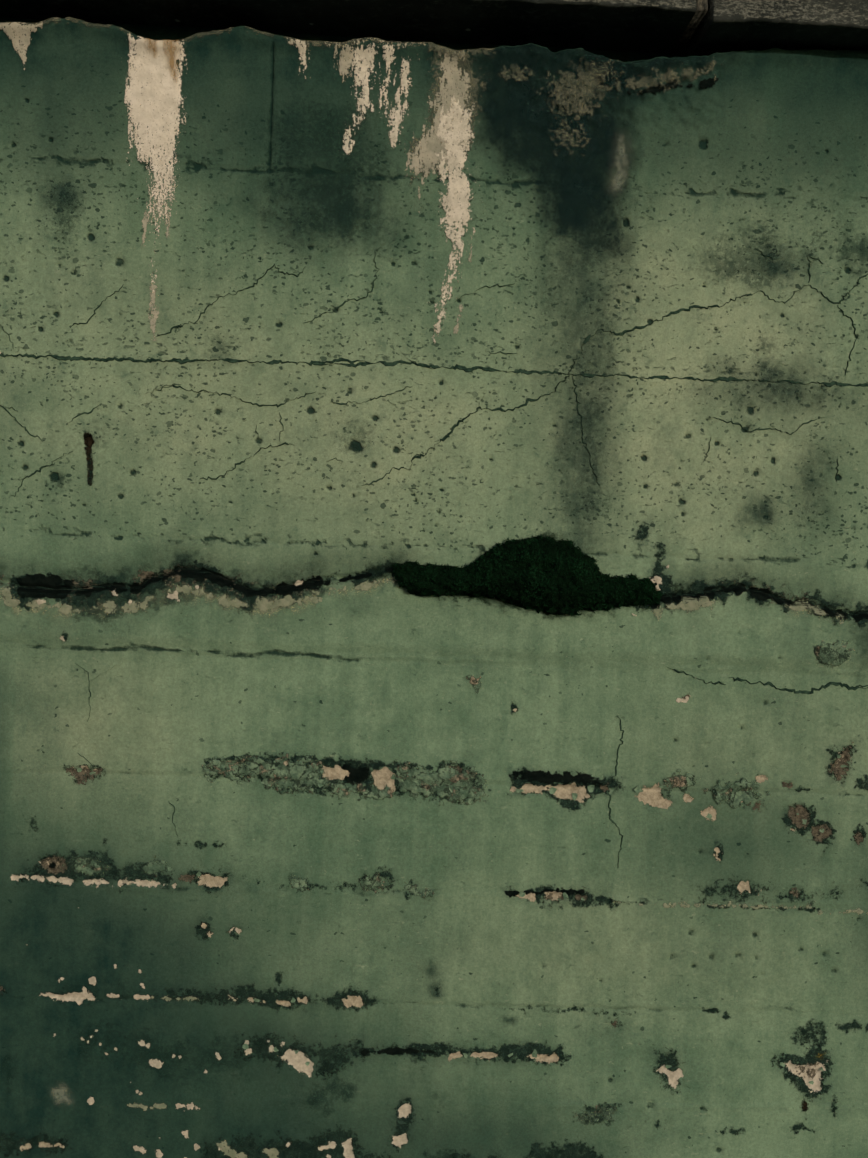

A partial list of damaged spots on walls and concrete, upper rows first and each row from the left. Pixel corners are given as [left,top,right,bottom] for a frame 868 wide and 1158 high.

water stain [0,17,709,344]
crack [0,250,868,496]
crack [670,668,868,694]
spalling [202,752,489,806]
spalling [509,767,771,821]
spalling [11,850,230,893]
spalling [505,877,822,915]
spalling [39,969,376,1012]
peeling [138,1038,182,1069]
spalling [210,1033,572,1080]
peeling [771,1020,833,1099]
peeling [133,1137,163,1158]